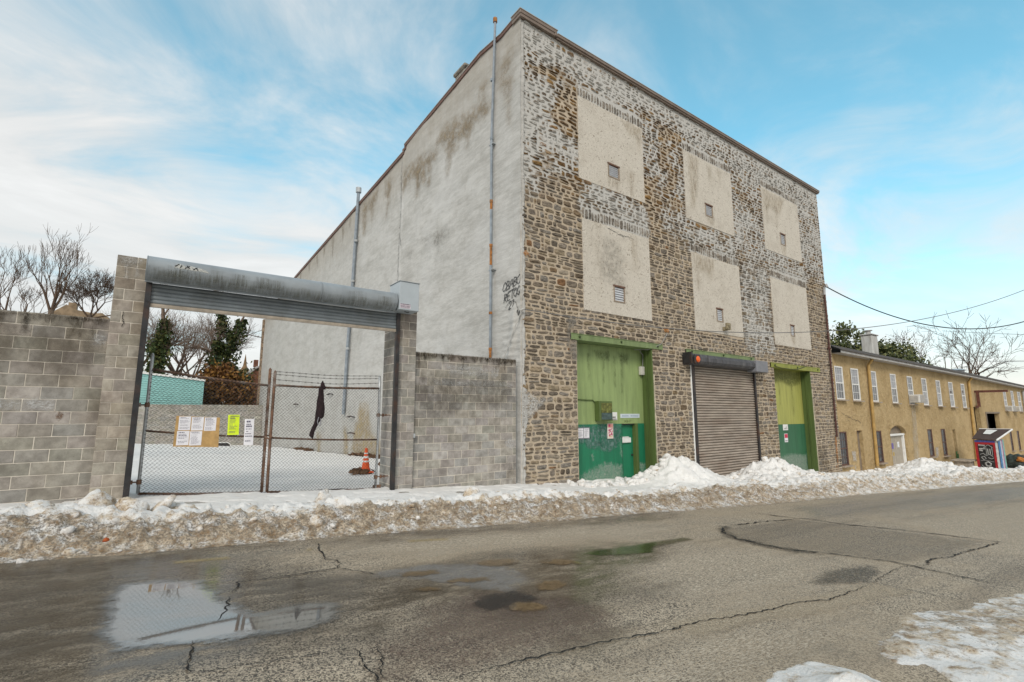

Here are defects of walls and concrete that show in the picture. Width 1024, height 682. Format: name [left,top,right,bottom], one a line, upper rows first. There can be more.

crack [218,542,373,620]
crack [454,513,1024,678]
crack [185,641,384,682]